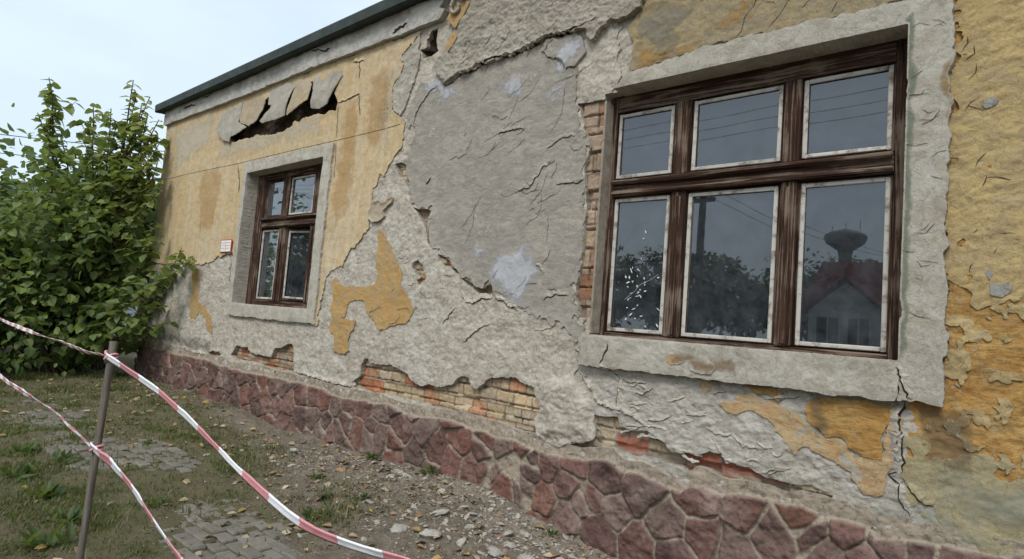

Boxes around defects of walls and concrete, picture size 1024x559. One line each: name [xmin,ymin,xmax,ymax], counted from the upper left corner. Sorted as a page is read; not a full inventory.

crack [165,1,597,343]
flaking render [141,0,941,533]
peeling [943,270,1024,388]
crack [888,364,936,517]
peeling [939,396,1013,452]
peeling [996,451,1024,475]